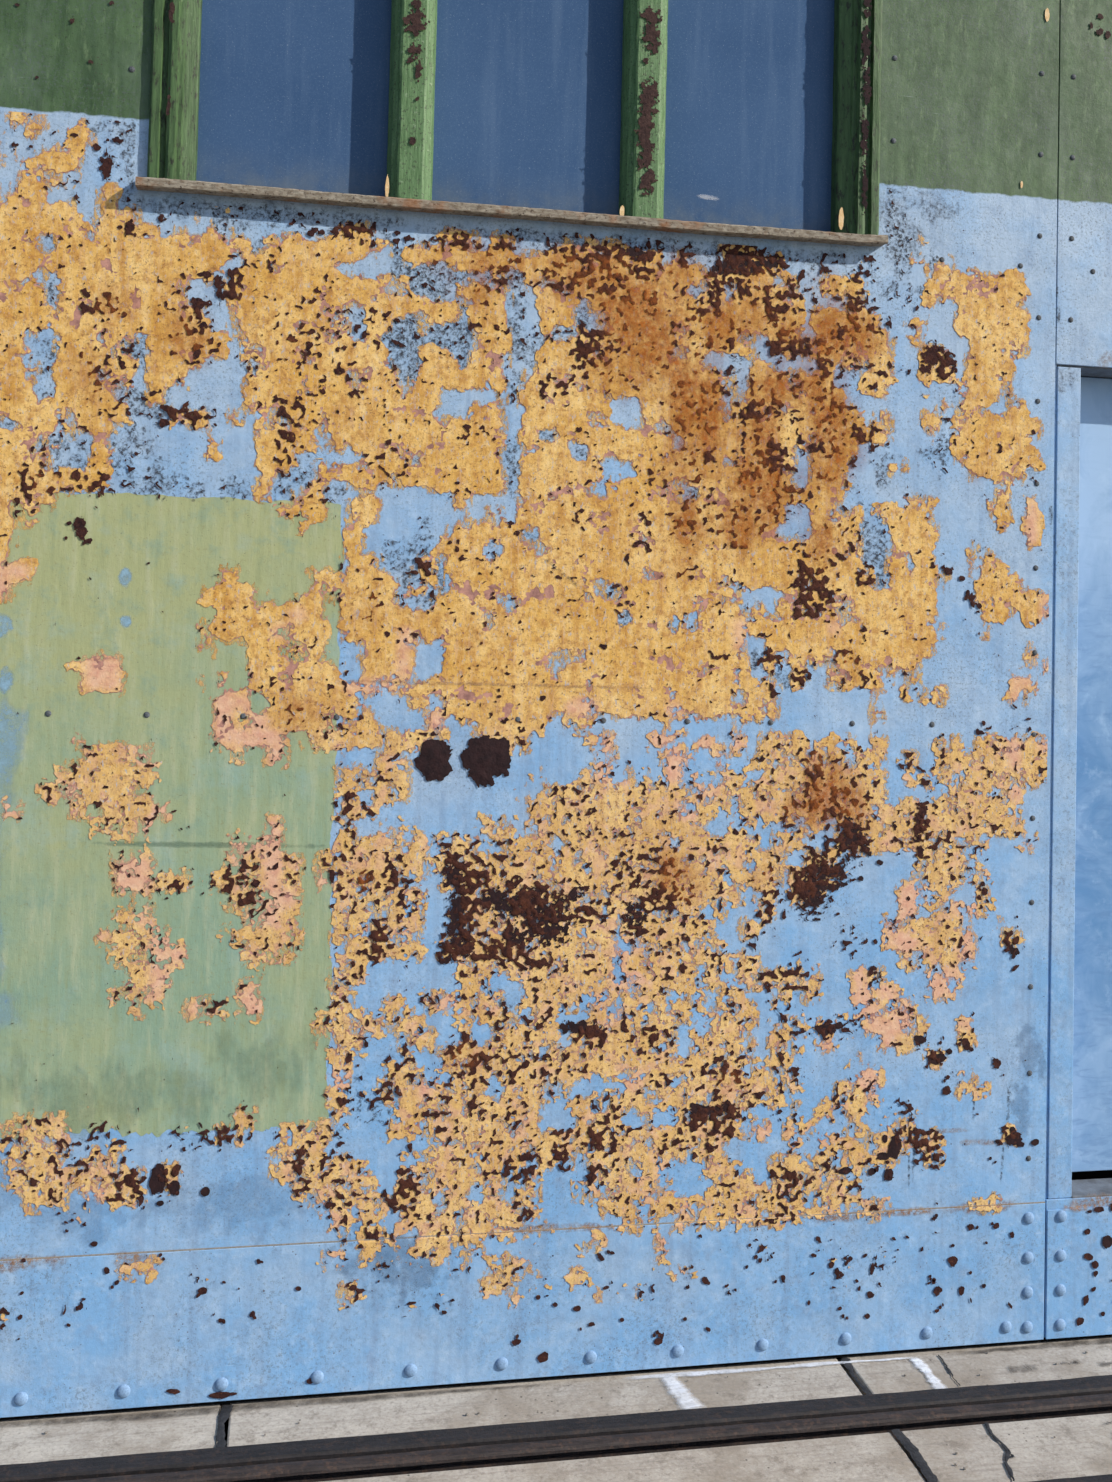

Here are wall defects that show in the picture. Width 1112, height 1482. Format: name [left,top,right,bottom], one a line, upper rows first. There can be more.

corrosion [626,246,653,261]
corrosion [705,251,779,275]
corrosion [414,735,511,788]
peeling [0,111,1049,1314]
corrosion [437,861,590,964]
corrosion [623,901,648,936]
corrosion [914,997,1042,1164]
corrosion [798,1088,1015,1320]
corrosion [1070,1196,1112,1326]
crack [984,1422,1015,1481]